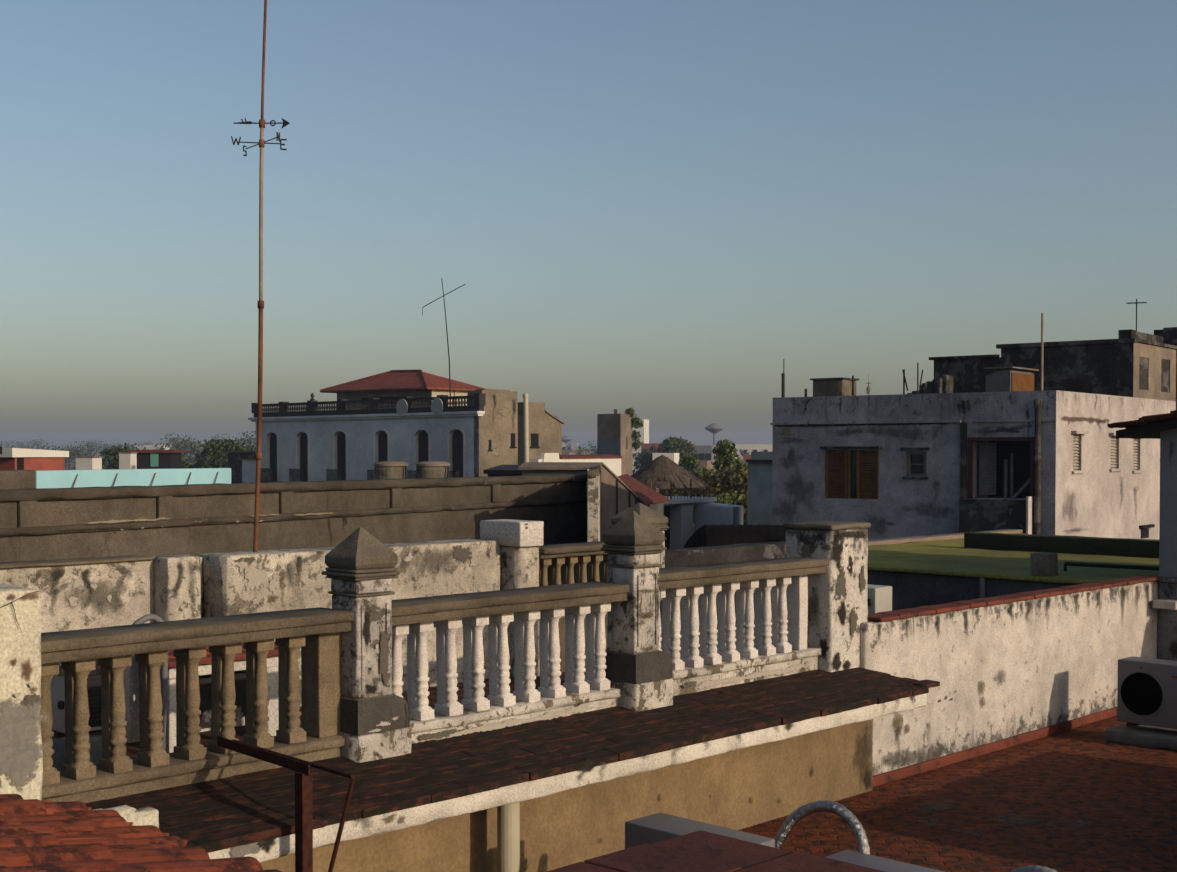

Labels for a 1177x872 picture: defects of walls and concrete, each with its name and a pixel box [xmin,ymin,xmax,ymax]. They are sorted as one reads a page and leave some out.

damp [798,518,892,547]
peeling [235,557,280,595]
peeling [808,593,818,618]
peeling [833,530,867,637]
damp [922,609,979,631]
damp [1009,584,1149,619]
peeling [363,608,390,693]
spalling [0,682,48,791]
damp [857,733,872,789]
damp [885,715,944,765]